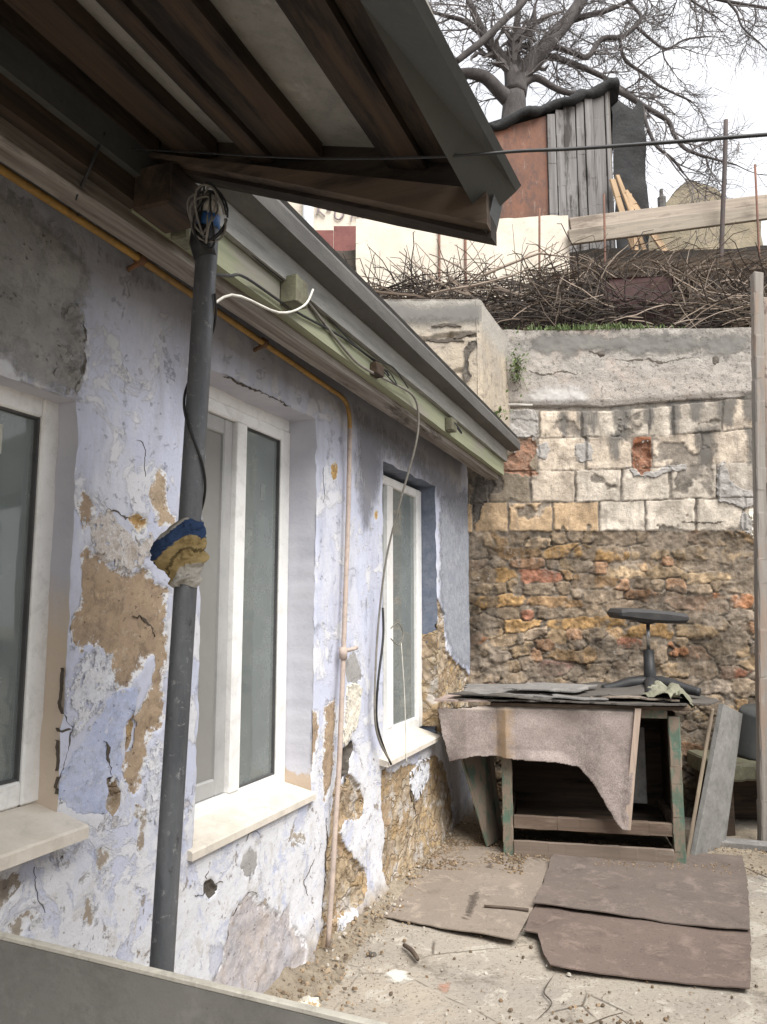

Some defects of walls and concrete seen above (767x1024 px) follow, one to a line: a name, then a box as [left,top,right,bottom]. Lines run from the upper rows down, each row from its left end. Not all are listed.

flaking render [0,193,89,401]
crack [224,376,290,407]
flaking render [503,437,538,477]
spalling [631,440,652,478]
peeling [65,467,176,857]
flaking render [381,755,453,887]
spalling [203,879,219,899]